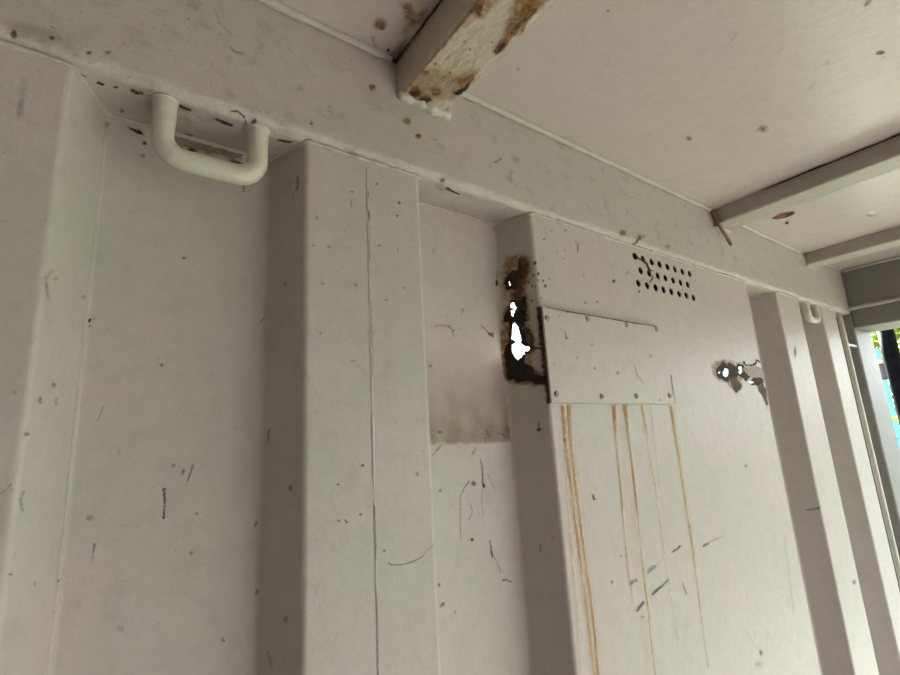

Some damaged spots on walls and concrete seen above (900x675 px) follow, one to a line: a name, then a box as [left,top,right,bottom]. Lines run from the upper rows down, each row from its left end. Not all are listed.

rust [404,0,492,103]
peeling [503,259,545,384]
rust [536,307,549,404]
rust [612,405,629,434]
peeling [716,361,768,406]
rust [561,405,599,675]